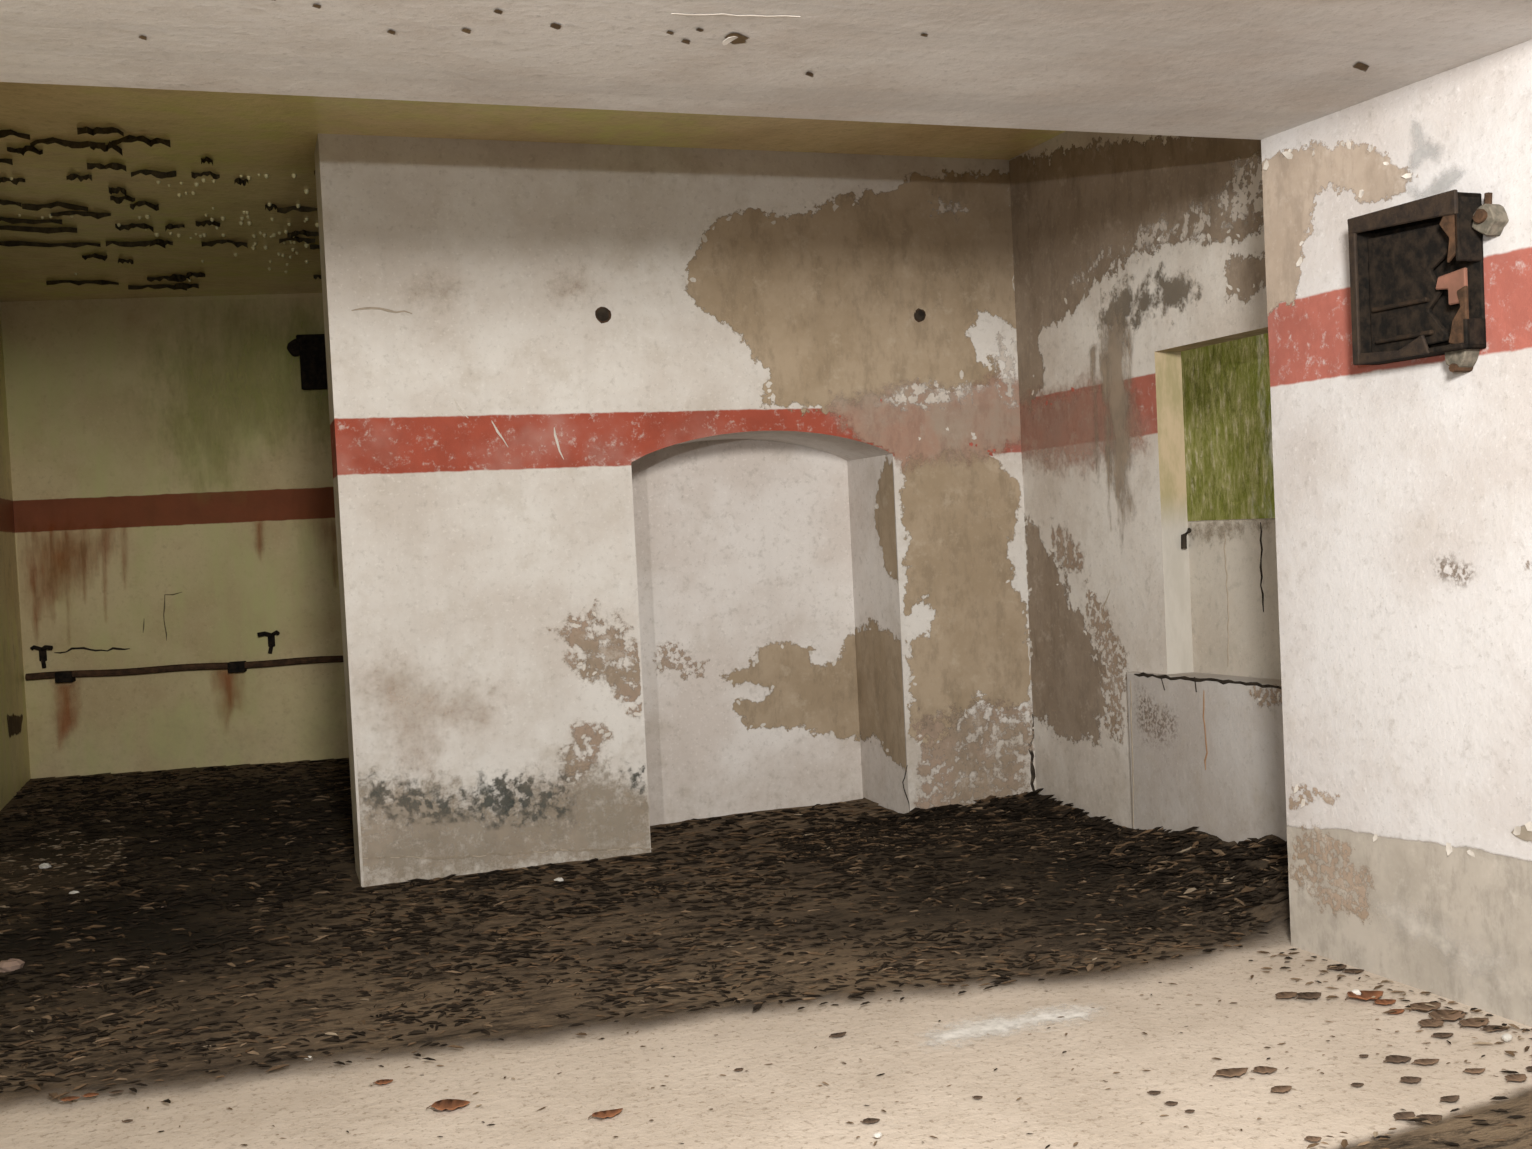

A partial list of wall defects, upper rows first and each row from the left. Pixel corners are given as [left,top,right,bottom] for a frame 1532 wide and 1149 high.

peeling [0,126,248,265]
peeling [46,272,205,291]
peeling [265,204,318,214]
peeling [279,230,320,250]
peeling [549,135,1418,809]
water stain [359,765,649,885]